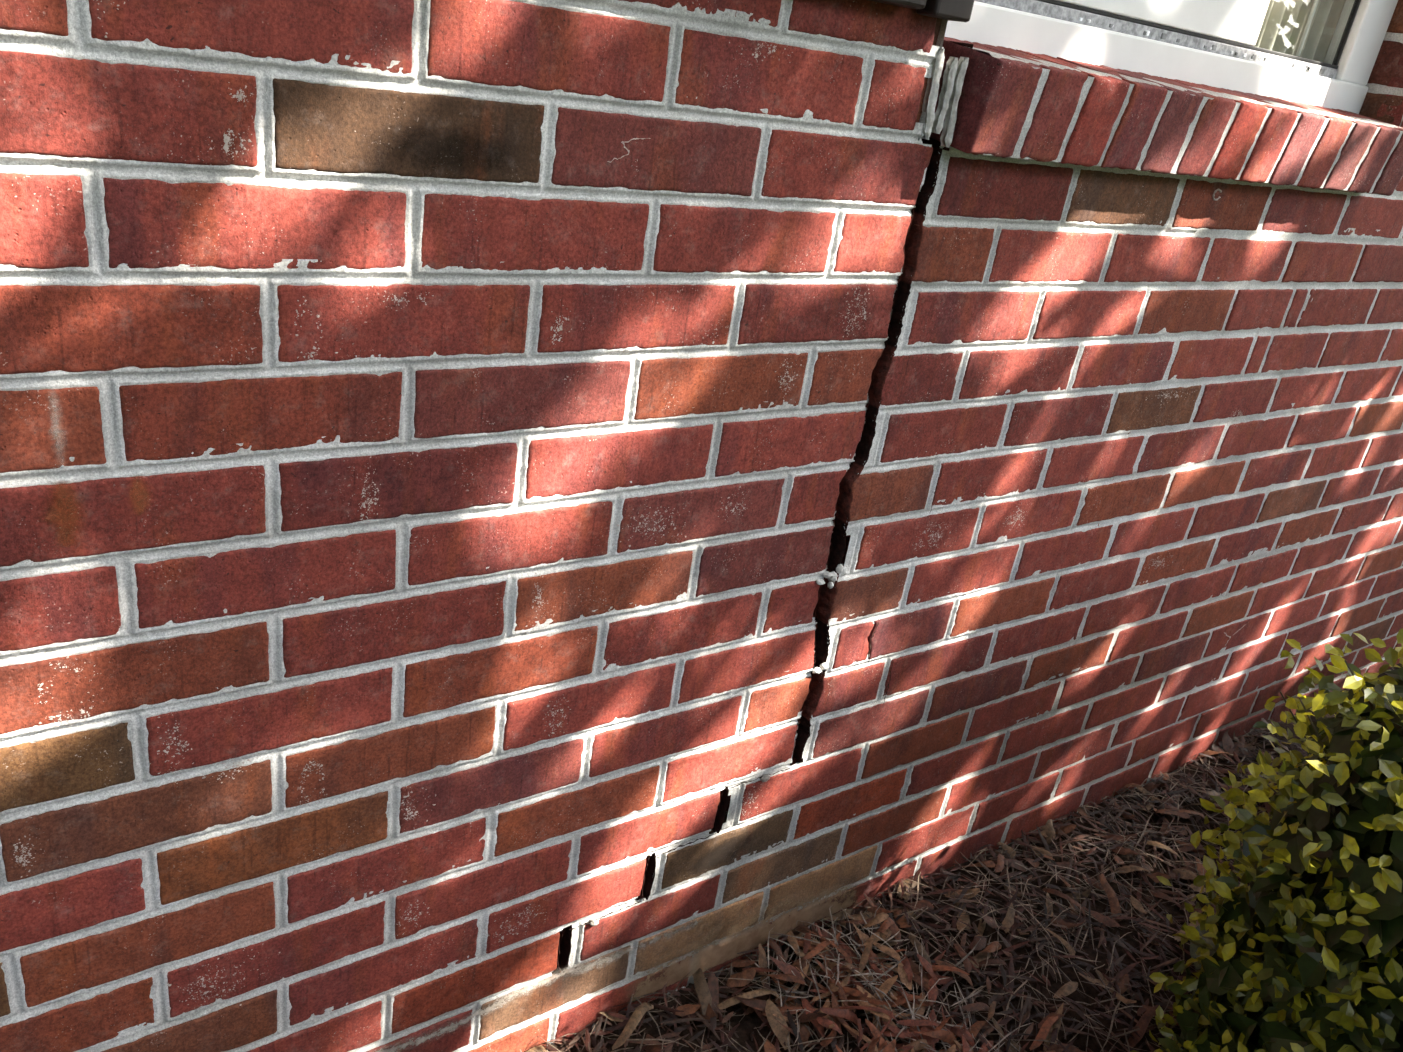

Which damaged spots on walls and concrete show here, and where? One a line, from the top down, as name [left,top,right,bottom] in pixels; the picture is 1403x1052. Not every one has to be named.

crack [939,41,974,49]
crack [557,137,950,974]